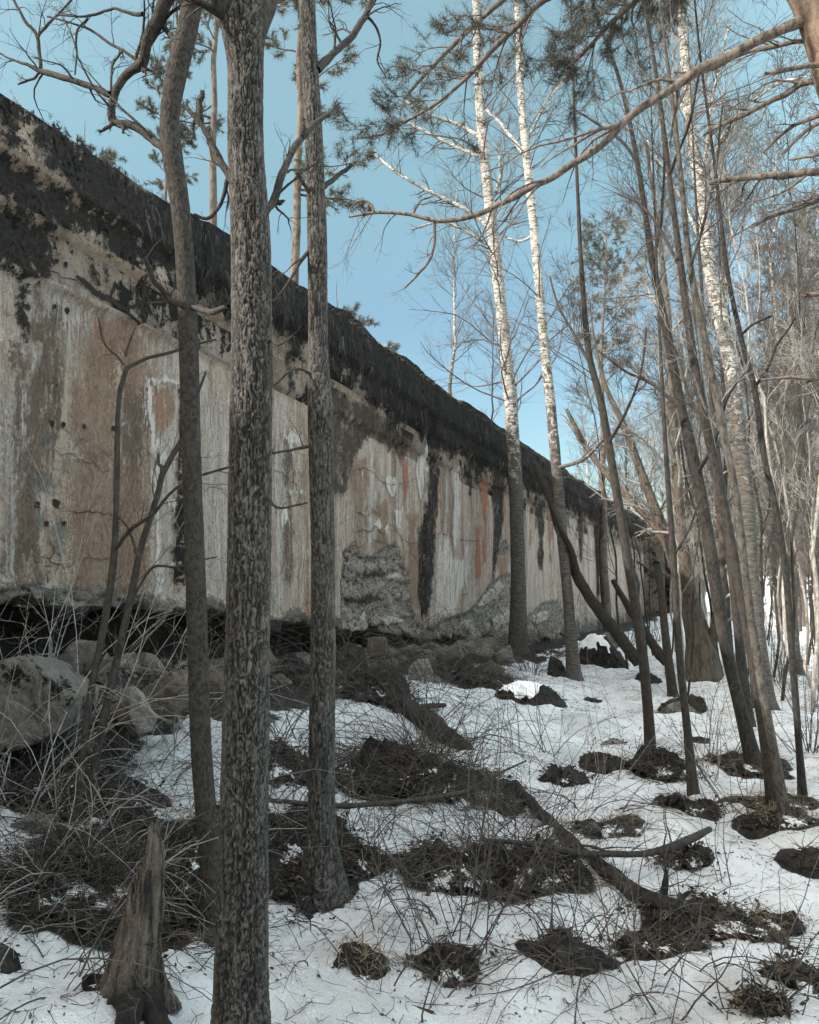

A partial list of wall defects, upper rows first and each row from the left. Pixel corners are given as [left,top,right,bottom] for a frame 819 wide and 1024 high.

water stain [0,100,186,597]
corrosion [150,383,175,436]
water stain [331,381,506,621]
spalling [336,475,511,644]
peeling [416,444,442,499]
corrosion [475,476,506,578]